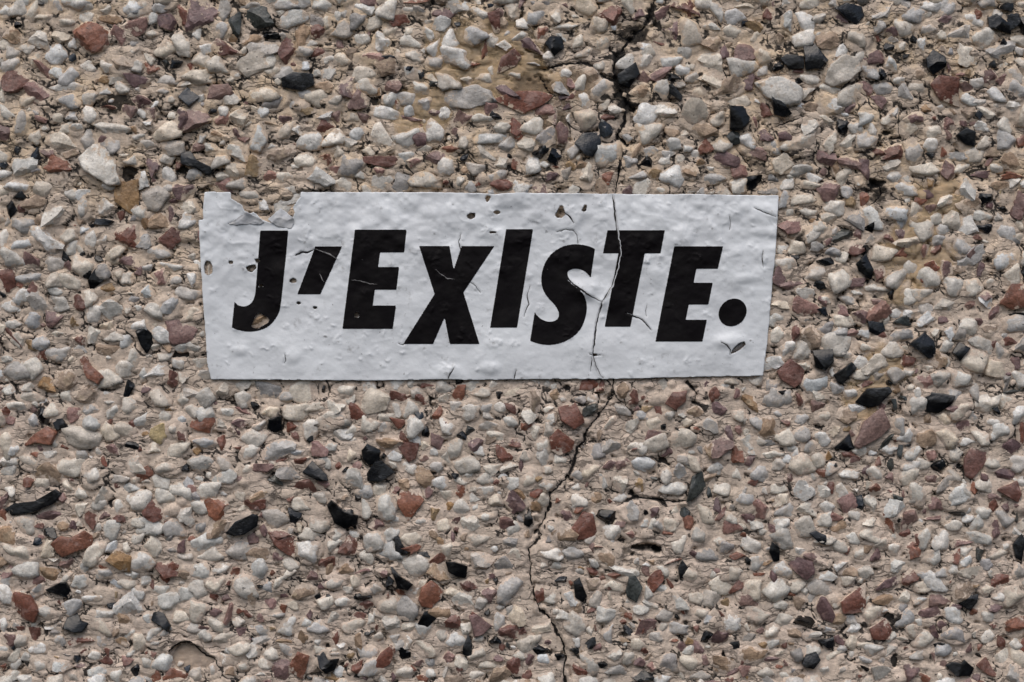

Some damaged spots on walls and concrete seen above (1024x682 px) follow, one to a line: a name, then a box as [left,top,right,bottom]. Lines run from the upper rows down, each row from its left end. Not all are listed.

crack [538,5,654,194]
crack [527,379,614,682]
crack [617,491,686,506]